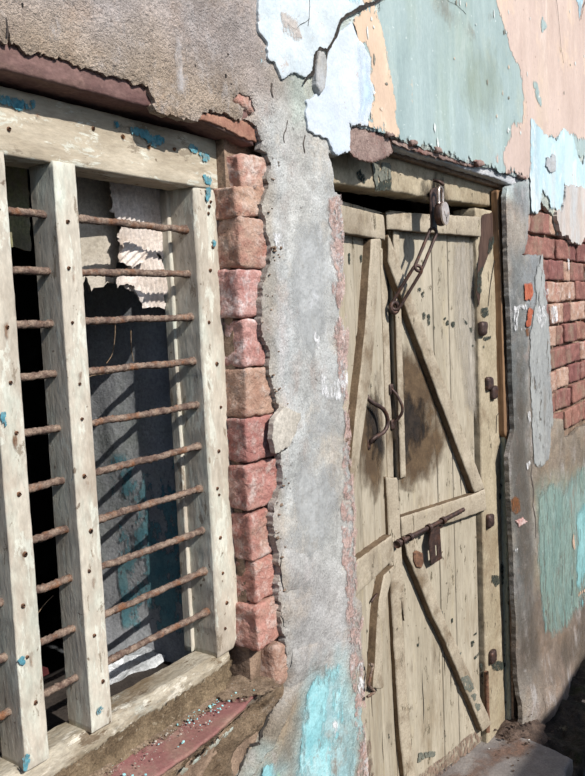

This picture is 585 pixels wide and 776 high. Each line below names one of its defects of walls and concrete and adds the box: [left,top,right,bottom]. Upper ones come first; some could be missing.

peeling [198,93,256,143]
crack [304,0,381,95]
peeling [256,0,585,429]
flaking render [298,195,369,776]
peeling [538,467,585,633]